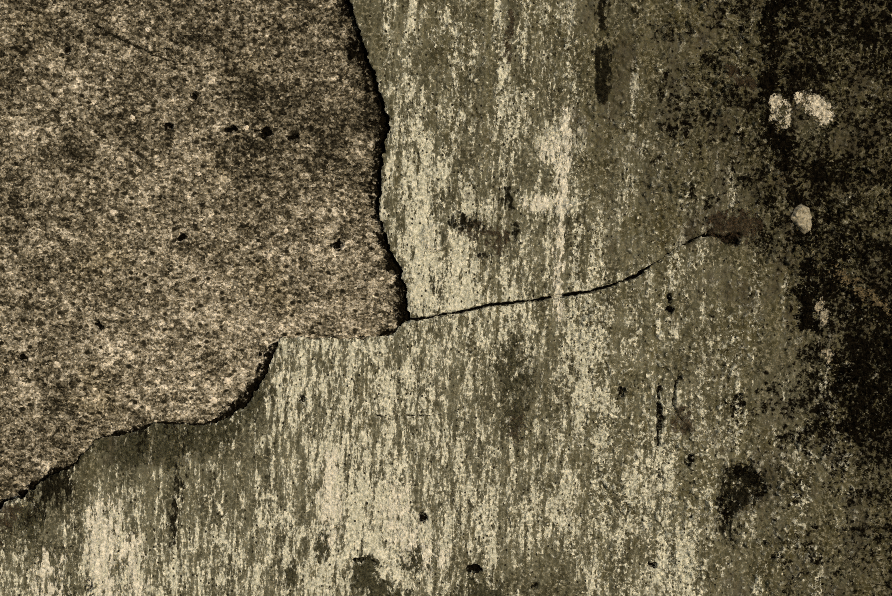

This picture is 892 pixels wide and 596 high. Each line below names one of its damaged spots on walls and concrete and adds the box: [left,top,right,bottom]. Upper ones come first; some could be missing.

spalling [0,0,407,567]
crack [406,233,731,321]
spalling [656,373,682,446]
spalling [725,393,746,419]
spalling [723,463,771,498]
spalling [716,492,740,524]
peeling [57,571,95,596]
peeling [284,557,297,589]
peeling [350,553,414,596]
peeling [400,541,433,573]
peeling [432,564,504,596]